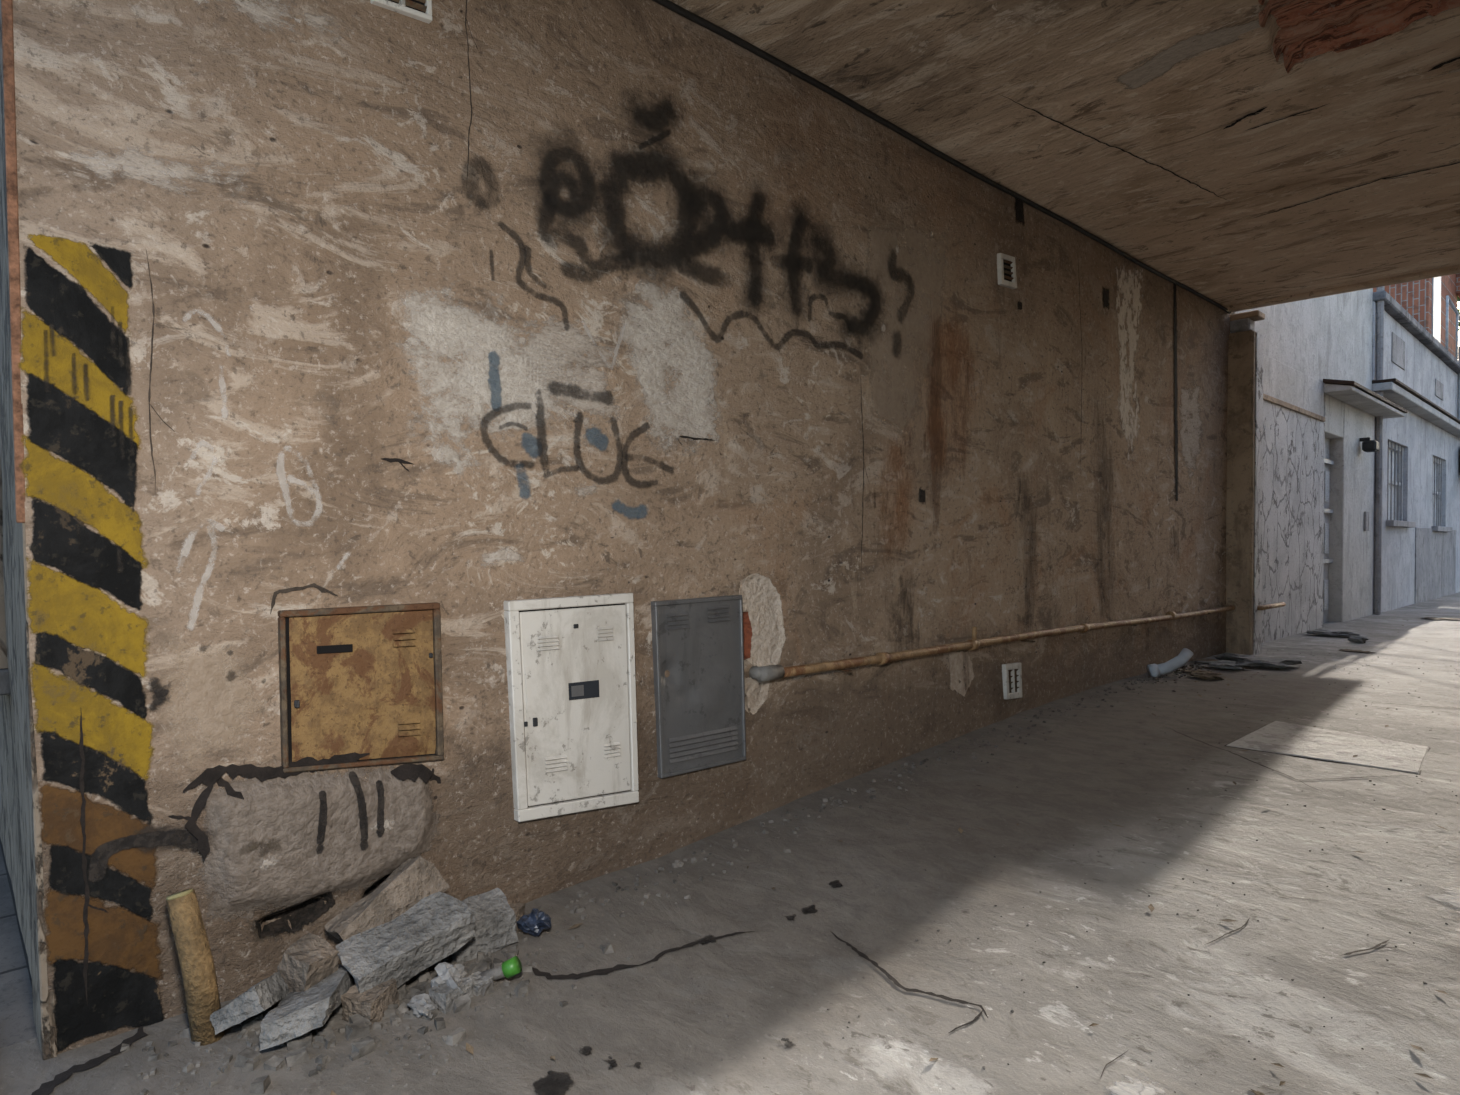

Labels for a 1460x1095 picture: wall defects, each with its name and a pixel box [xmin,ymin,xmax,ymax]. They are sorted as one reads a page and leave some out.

spalling [1252,0,1460,73]
crack [1428,57,1460,72]
spalling [739,573,871,715]
crack [532,931,754,979]
crack [831,932,988,1033]